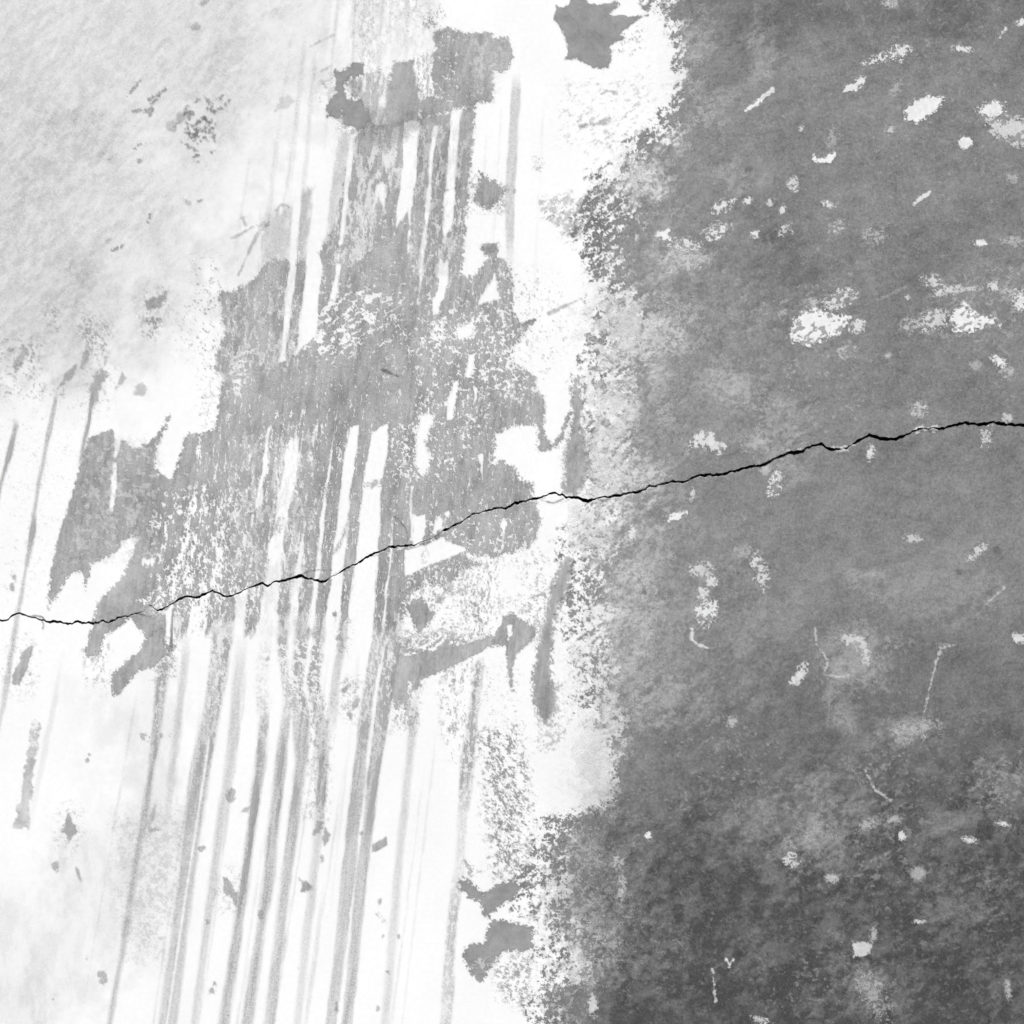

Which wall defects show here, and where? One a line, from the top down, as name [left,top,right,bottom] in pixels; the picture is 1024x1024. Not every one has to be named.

water stain [0,427,16,484]
water stain [26,515,36,565]
water stain [80,394,93,459]
crack [0,420,1024,628]
water stain [145,665,168,816]
water stain [187,636,230,827]
water stain [226,719,266,995]
water stain [262,634,320,915]
water stain [317,749,326,806]
water stain [345,634,401,875]
water stain [460,668,480,789]
water stain [604,761,1024,1024]